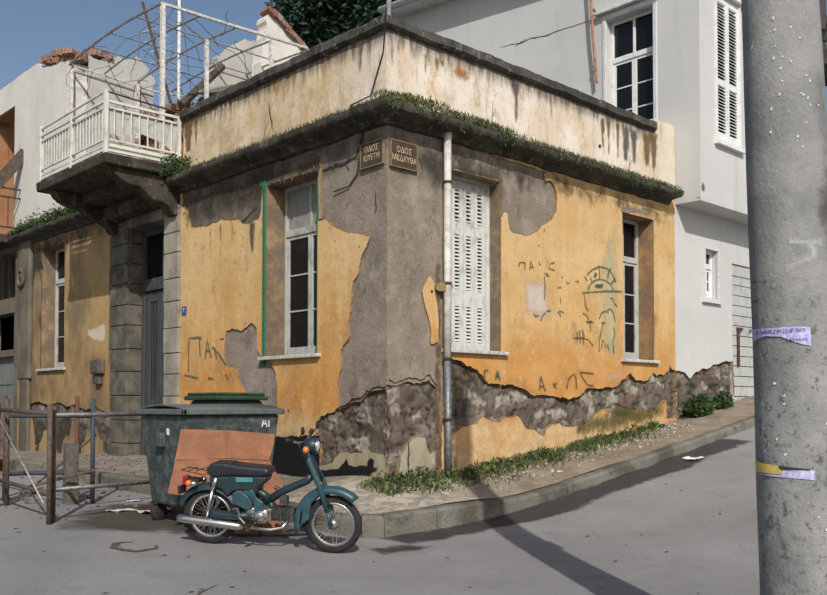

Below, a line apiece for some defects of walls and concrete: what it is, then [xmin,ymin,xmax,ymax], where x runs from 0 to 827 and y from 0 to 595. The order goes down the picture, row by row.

crack [501,20,590,48]
leakage [623,126,637,162]
flaking render [182,125,734,477]